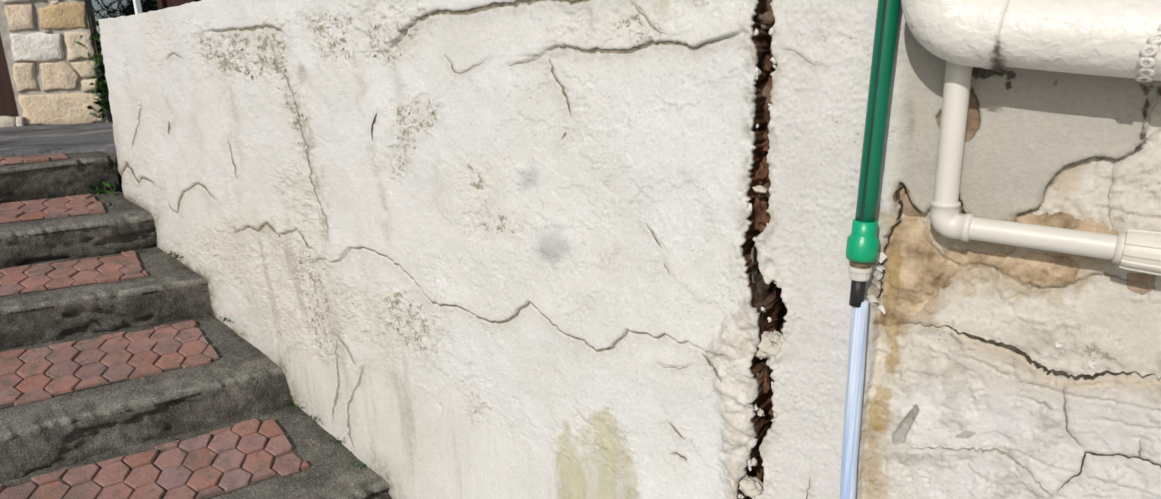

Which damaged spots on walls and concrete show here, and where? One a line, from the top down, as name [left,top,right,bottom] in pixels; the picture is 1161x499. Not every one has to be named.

crack [405,0,589,35]
crack [444,2,726,139]
crack [121,104,213,213]
crack [212,25,721,382]
crack [748,0,816,427]
spalling [865,182,1079,326]
spalling [1012,210,1118,235]
crack [1034,152,1136,223]
spalling [1127,273,1156,295]
crack [332,336,363,441]
crack [900,322,1161,496]
crack [738,457,764,499]